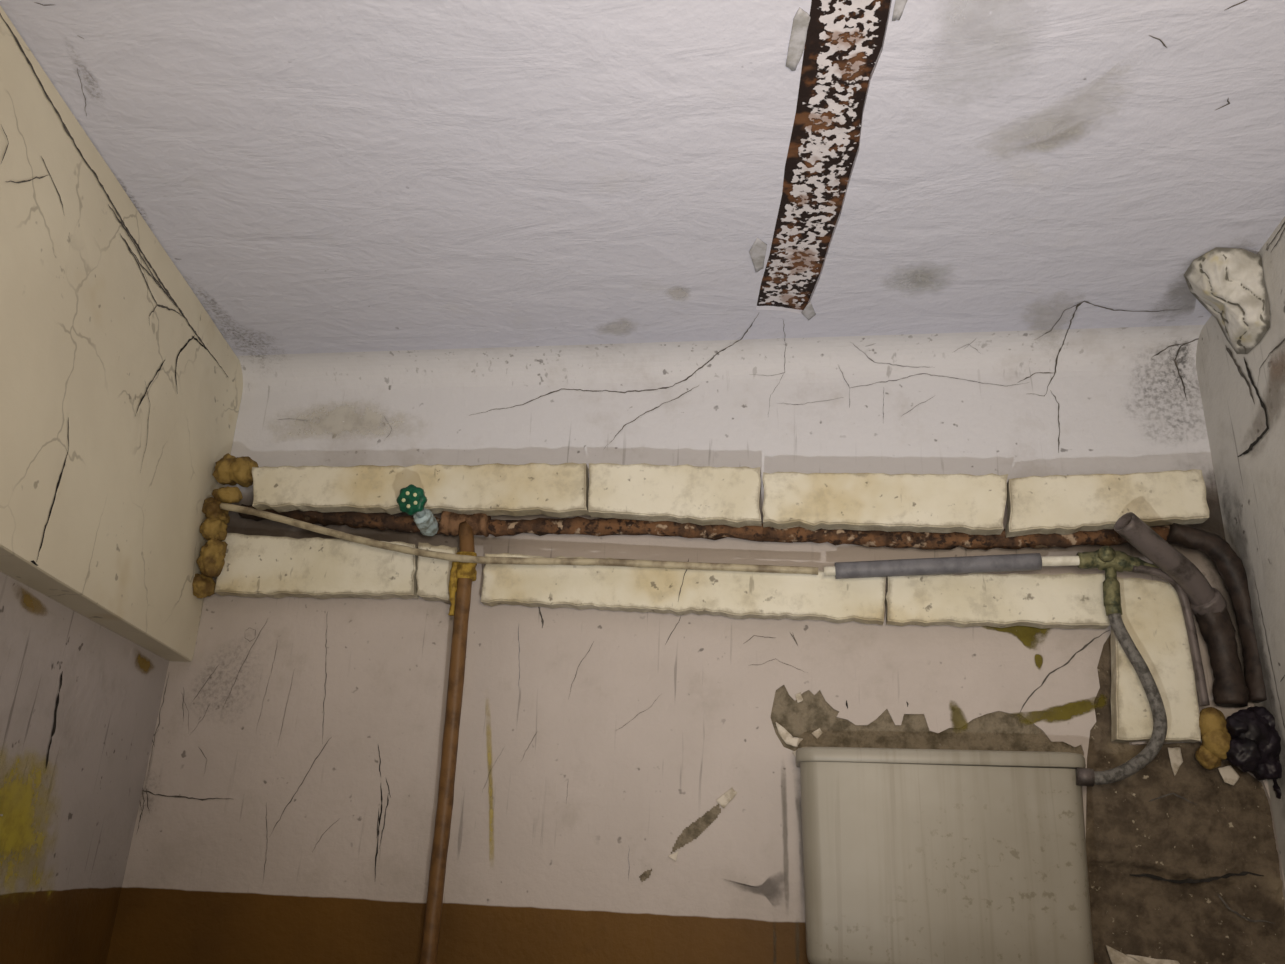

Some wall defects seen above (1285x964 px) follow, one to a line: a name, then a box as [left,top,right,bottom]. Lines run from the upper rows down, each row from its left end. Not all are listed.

spalling [749,0,907,321]
crack [0,14,228,472]
crack [1266,222,1285,252]
crack [469,301,1181,453]
crack [1154,338,1285,457]
crack [31,417,69,566]
flaking render [770,634,1285,964]